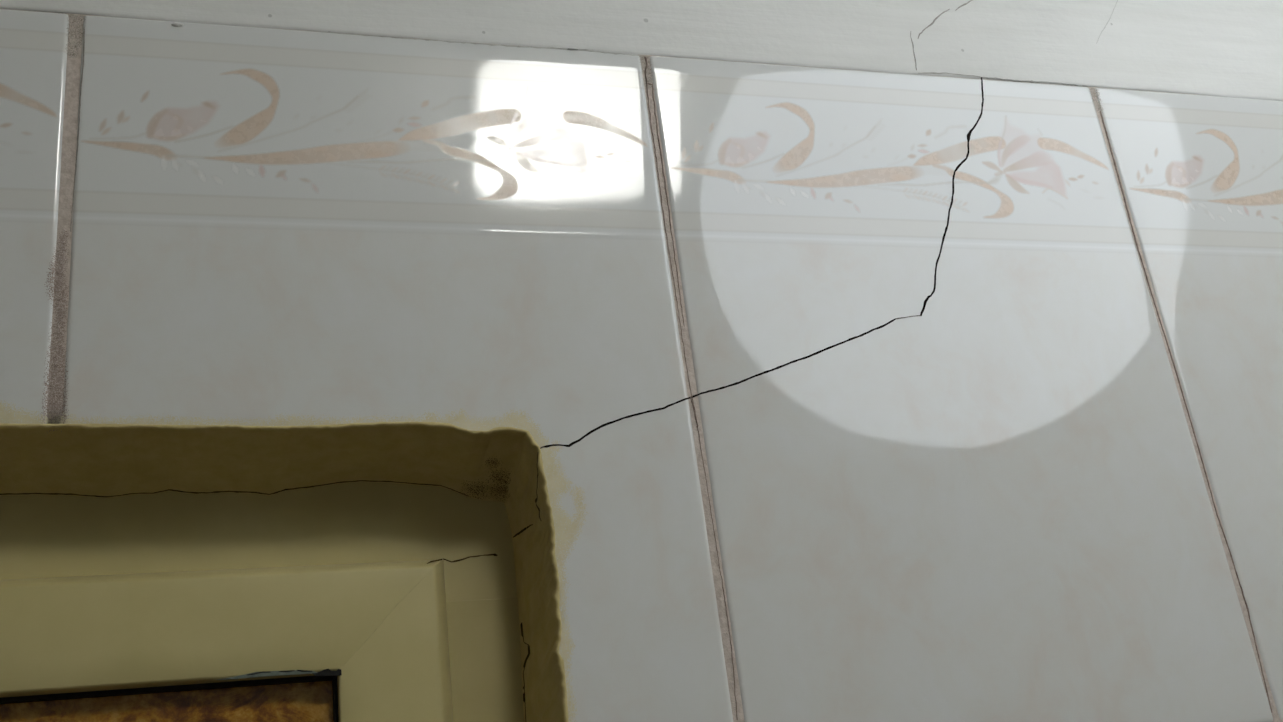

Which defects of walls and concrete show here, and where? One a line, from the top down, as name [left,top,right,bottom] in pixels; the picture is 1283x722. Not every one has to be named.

crack [910,0,972,70]
crack [427,57,984,720]
crack [0,480,468,497]